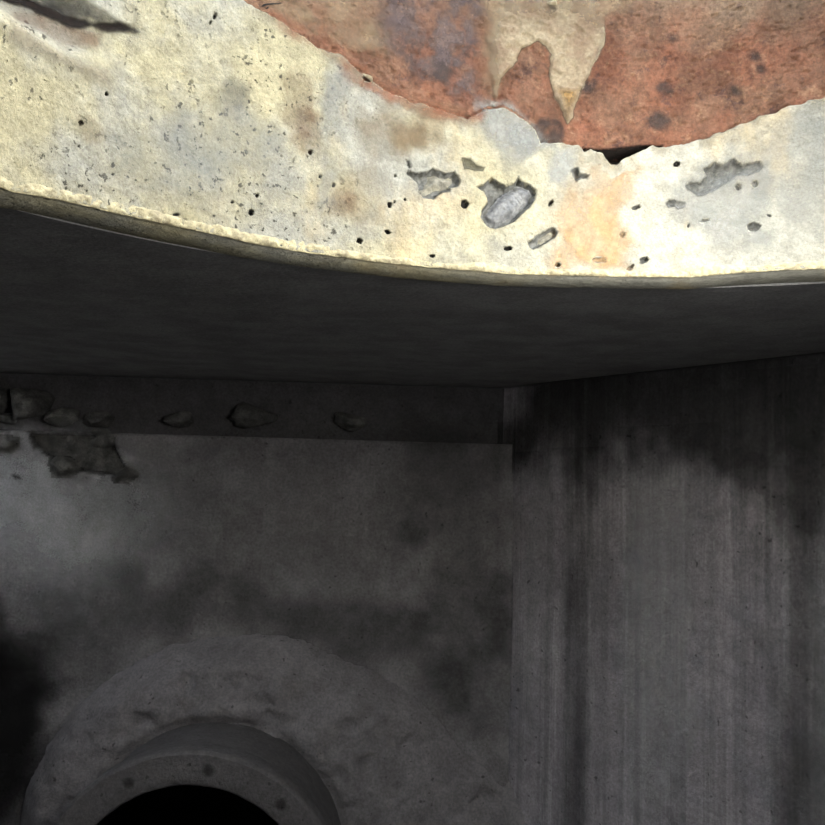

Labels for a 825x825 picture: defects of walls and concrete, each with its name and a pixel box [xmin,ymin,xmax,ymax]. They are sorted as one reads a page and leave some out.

hole [407,158,485,200]
hole [686,159,763,196]
hole [478,178,536,229]
hole [666,200,685,209]